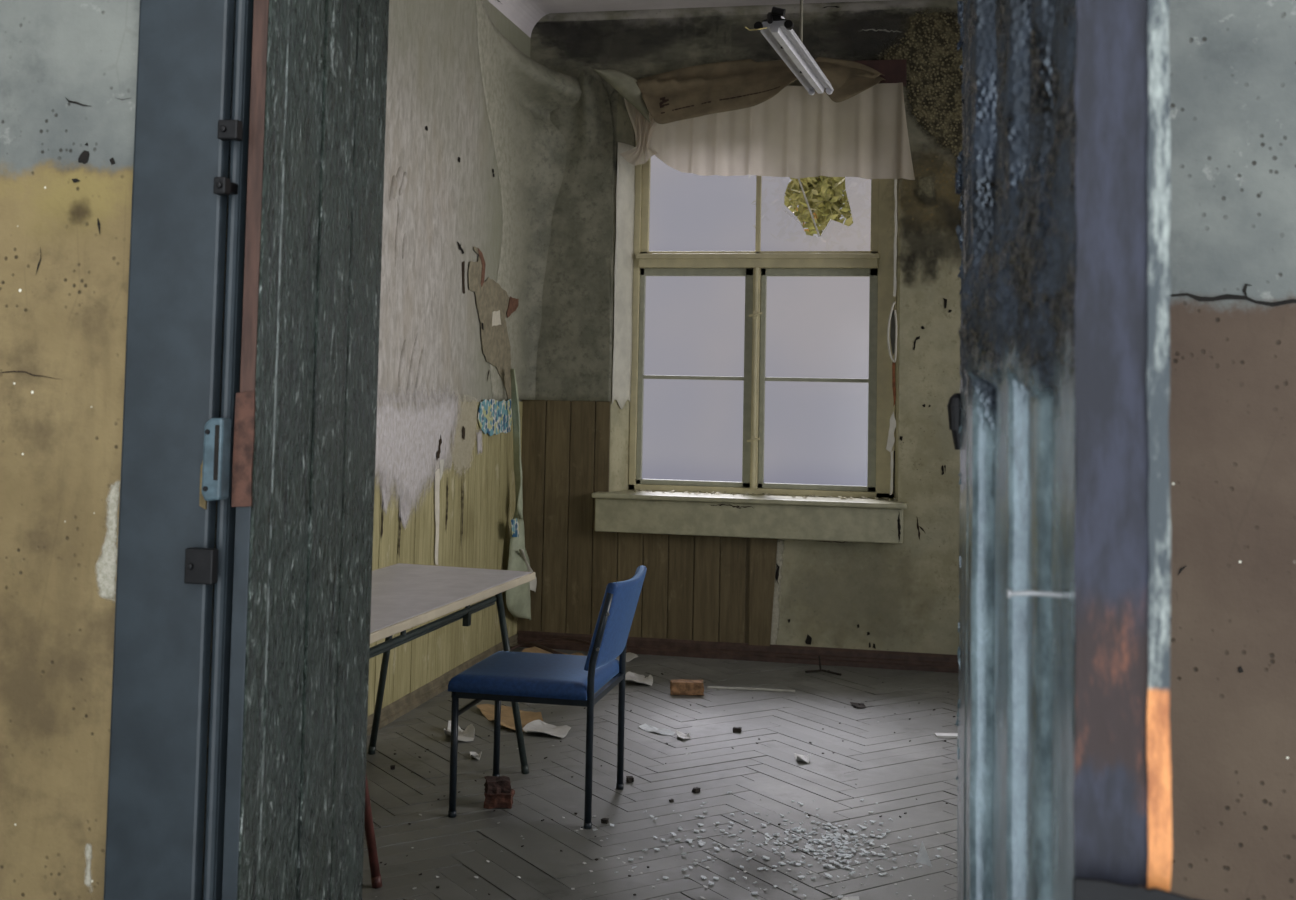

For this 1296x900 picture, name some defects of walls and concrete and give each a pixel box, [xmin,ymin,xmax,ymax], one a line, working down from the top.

crack [1170,284,1296,307]
peeling [375,391,482,565]
peeling [97,482,119,599]
spalling [770,541,790,645]